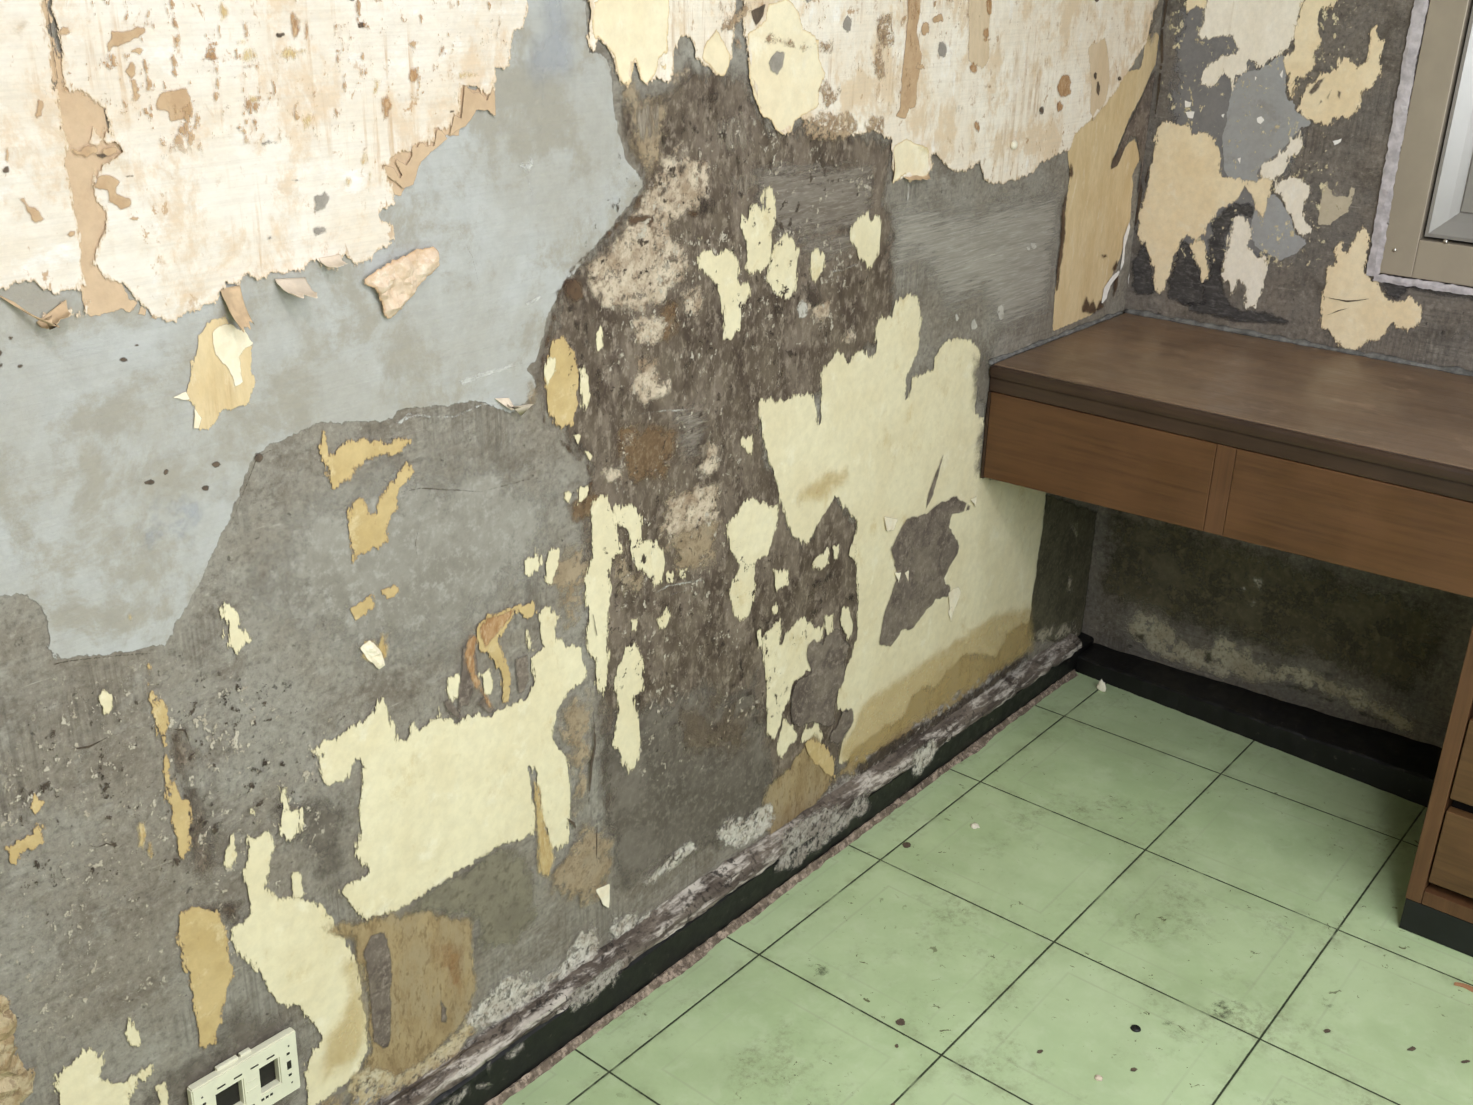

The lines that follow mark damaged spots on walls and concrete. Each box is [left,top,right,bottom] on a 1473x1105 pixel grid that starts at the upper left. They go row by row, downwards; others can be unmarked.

peeling [0,0,1082,1105]
leakage [322,65,1444,1105]
leakage [187,792,217,873]
leakage [277,800,344,885]
leakage [202,904,240,922]
leakage [149,1012,283,1105]